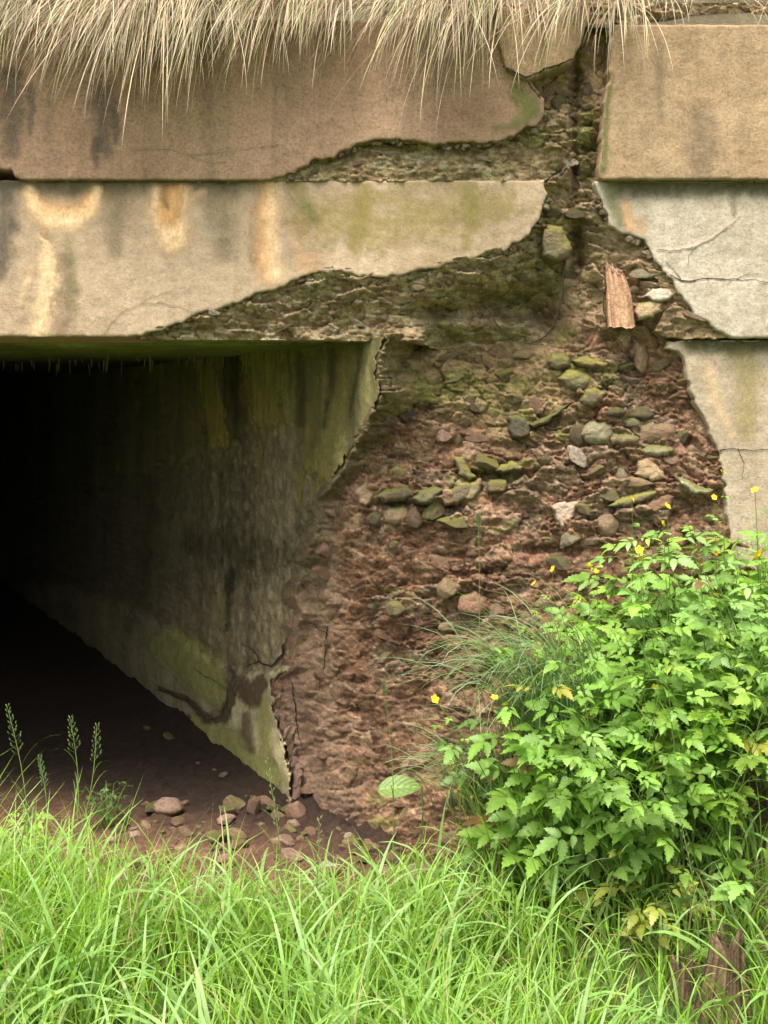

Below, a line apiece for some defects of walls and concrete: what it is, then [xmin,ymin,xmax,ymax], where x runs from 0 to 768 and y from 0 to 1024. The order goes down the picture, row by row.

spalling [272,126,559,182]
corrosion [148,185,189,253]
corrosion [257,181,286,283]
spalling [134,197,564,356]
spalling [591,194,608,220]
spalling [624,234,728,340]
crack [656,217,765,282]
damp [149,627,231,706]
crack [155,620,328,721]
peeling [158,665,303,800]